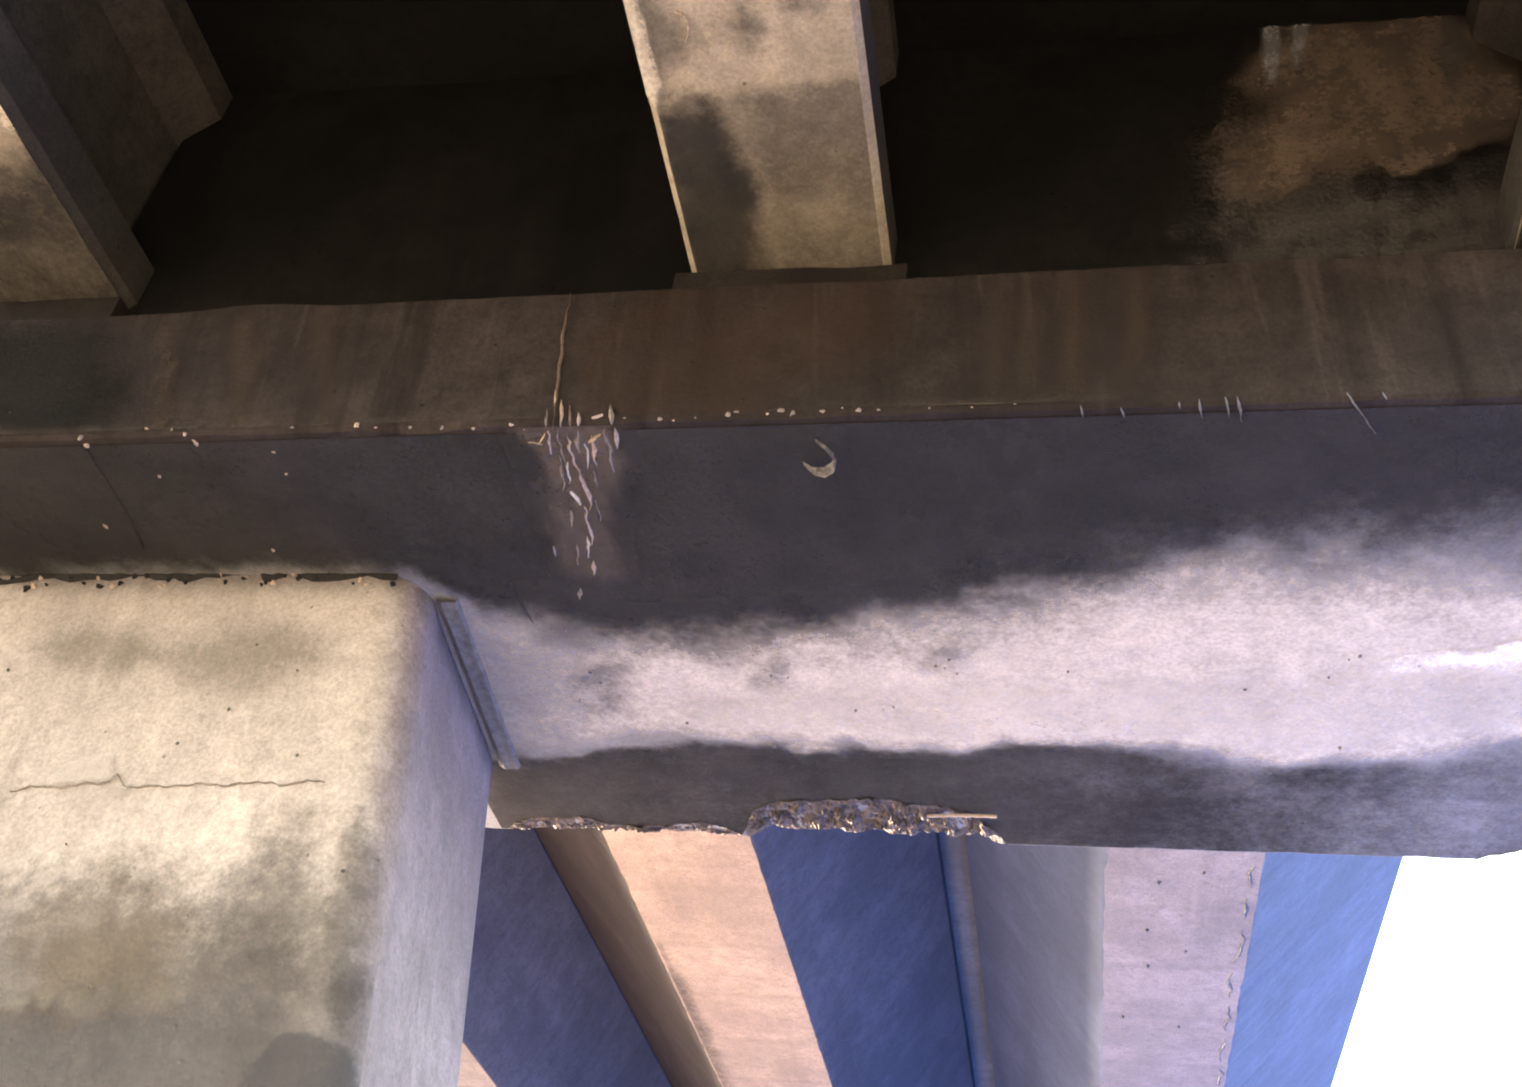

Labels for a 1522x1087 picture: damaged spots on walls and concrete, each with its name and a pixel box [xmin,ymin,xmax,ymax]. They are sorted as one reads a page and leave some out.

crack [552,293,571,430]
efflorescence [509,389,626,575]
damp [505,567,1522,764]
crack [10,756,325,792]
spalling [509,798,1003,844]